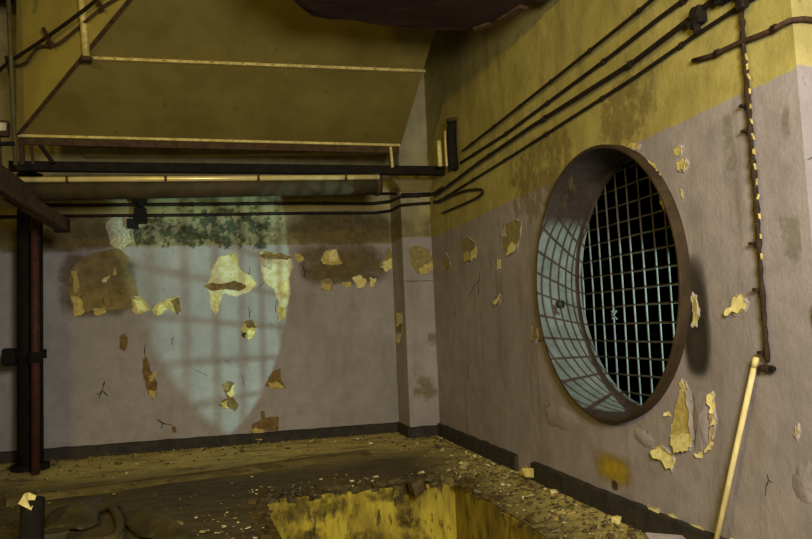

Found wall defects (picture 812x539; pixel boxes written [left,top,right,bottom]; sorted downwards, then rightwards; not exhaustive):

water stain [134,202,283,249]
peeling [69,217,182,318]
peeling [204,251,305,321]
peeling [320,248,343,265]
peeling [320,275,376,291]
peeling [379,247,393,273]
peeling [496,219,522,273]
peeling [691,292,700,328]
peeling [724,293,750,317]
peeling [219,380,239,411]
peeling [650,378,718,472]